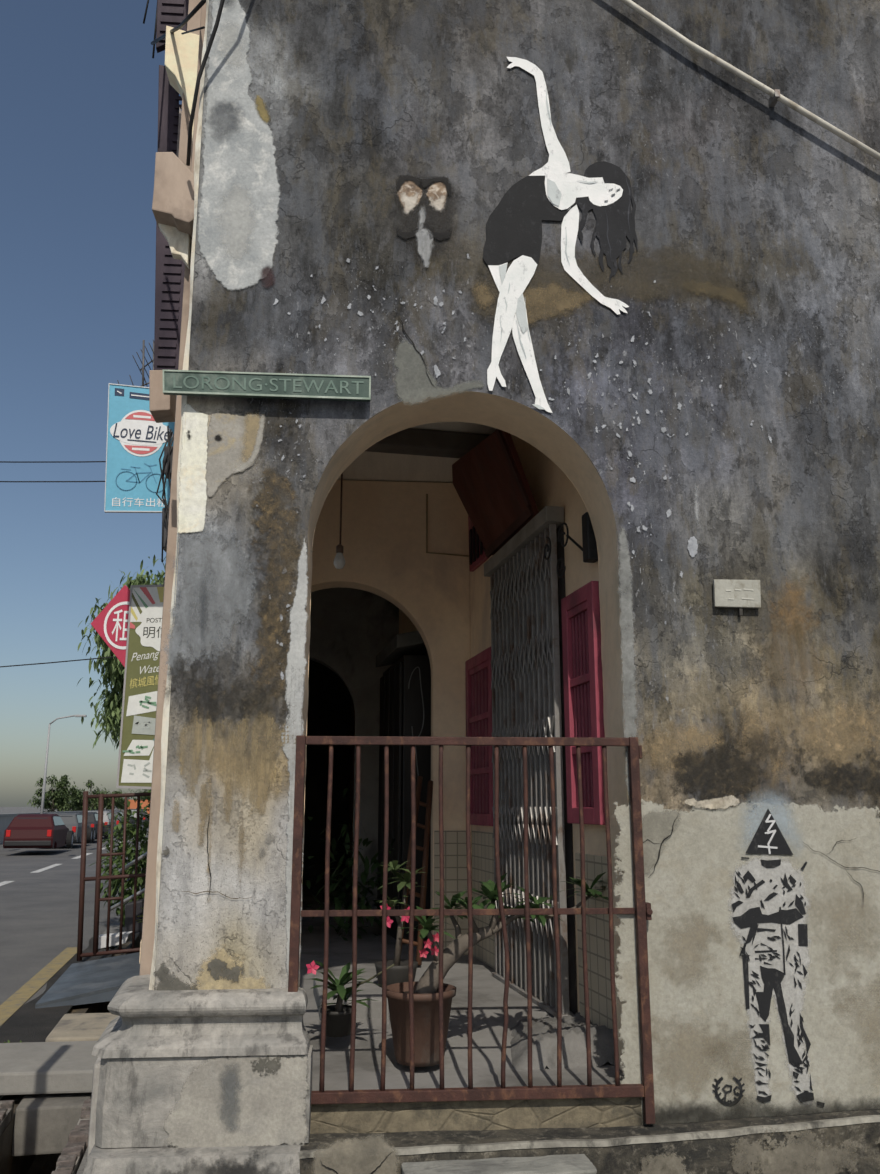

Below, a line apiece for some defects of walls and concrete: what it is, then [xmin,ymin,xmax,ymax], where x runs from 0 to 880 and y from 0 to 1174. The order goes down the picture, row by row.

flaking render [197,0,280,290]
flaking render [206,412,264,497]
water stain [165,663,296,872]
water stain [652,706,880,811]
crack [182,816,251,899]
spalling [642,795,740,878]
crack [803,838,880,903]
crack [313,1135,399,1174]